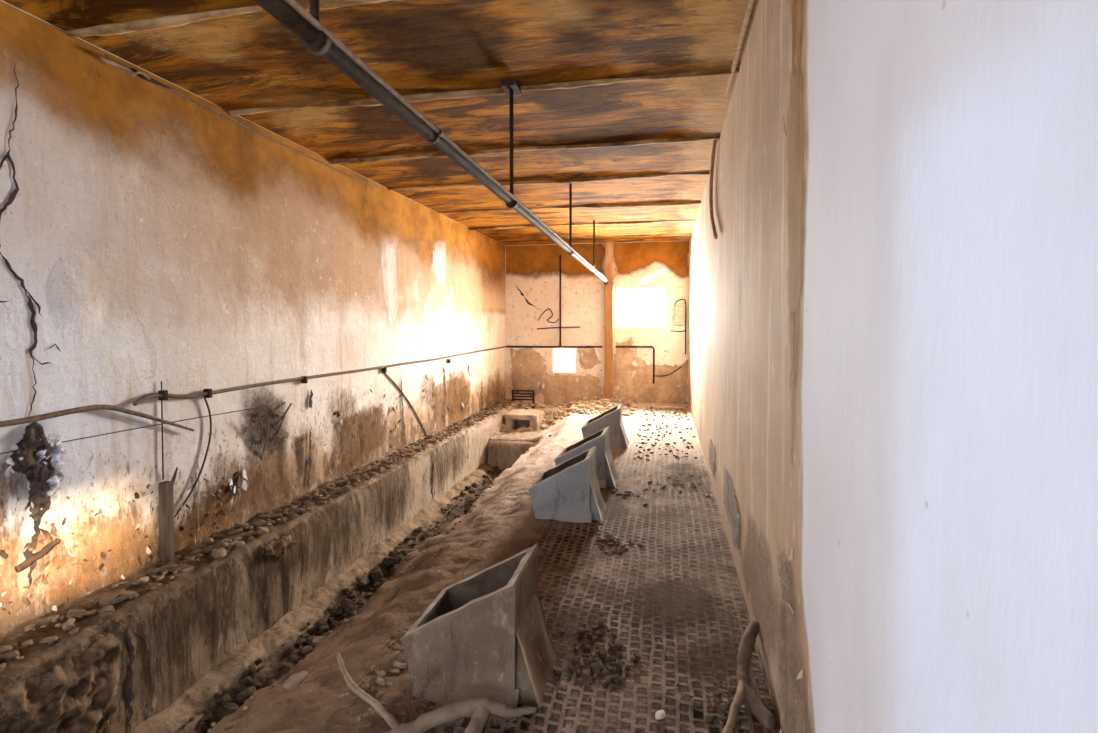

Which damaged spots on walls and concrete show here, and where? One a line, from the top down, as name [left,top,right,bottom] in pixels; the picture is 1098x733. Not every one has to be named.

water stain [541,0,747,98]
crack [0,63,61,414]
water stain [0,1,689,324]
spalling [0,422,159,614]
water stain [140,557,237,686]
water stain [743,520,784,654]